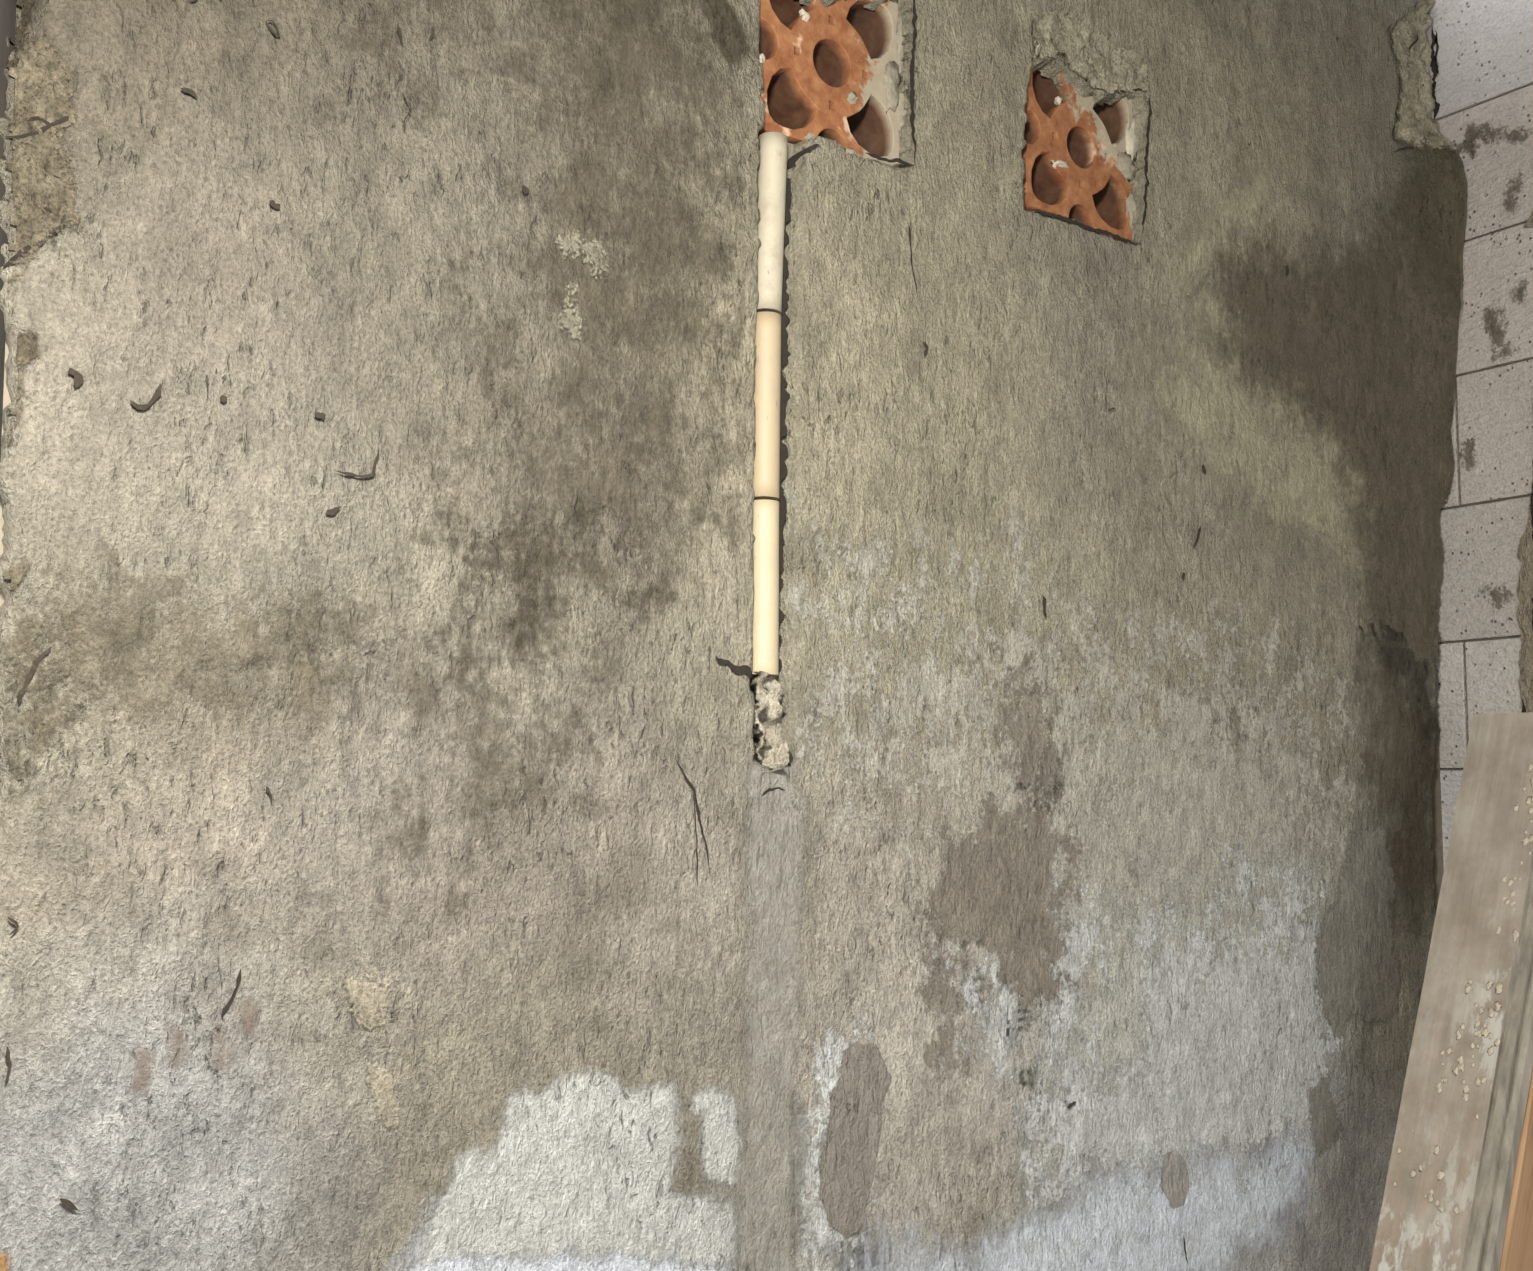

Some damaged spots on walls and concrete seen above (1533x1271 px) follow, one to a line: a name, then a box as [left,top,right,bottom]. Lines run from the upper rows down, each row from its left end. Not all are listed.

spalling [1389,0,1457,151]
crack [1525,462,1533,539]
damp [1155,163,1461,1038]
damp [838,1075,1343,1271]
corrosion [0,1253,12,1271]
damp [406,1232,733,1271]